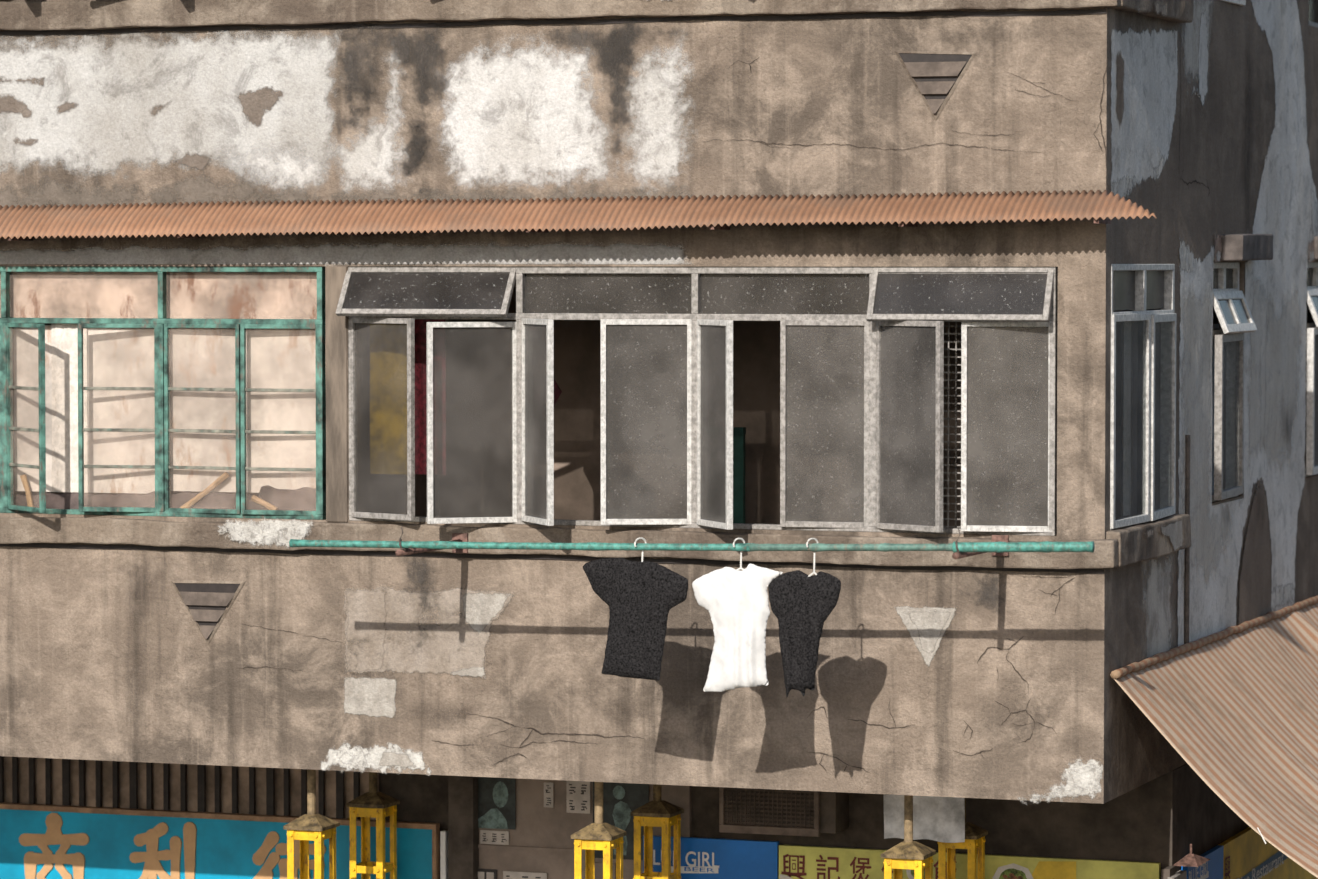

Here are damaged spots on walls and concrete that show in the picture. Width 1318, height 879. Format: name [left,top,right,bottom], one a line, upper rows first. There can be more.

peeling [0,28,407,191]
water stain [342,31,446,127]
water stain [404,124,427,174]
water stain [554,22,642,123]
peeling [1144,0,1318,658]
spalling [219,518,313,547]
crack [955,637,1056,758]
spalling [320,743,431,774]
spalling [1019,759,1103,803]